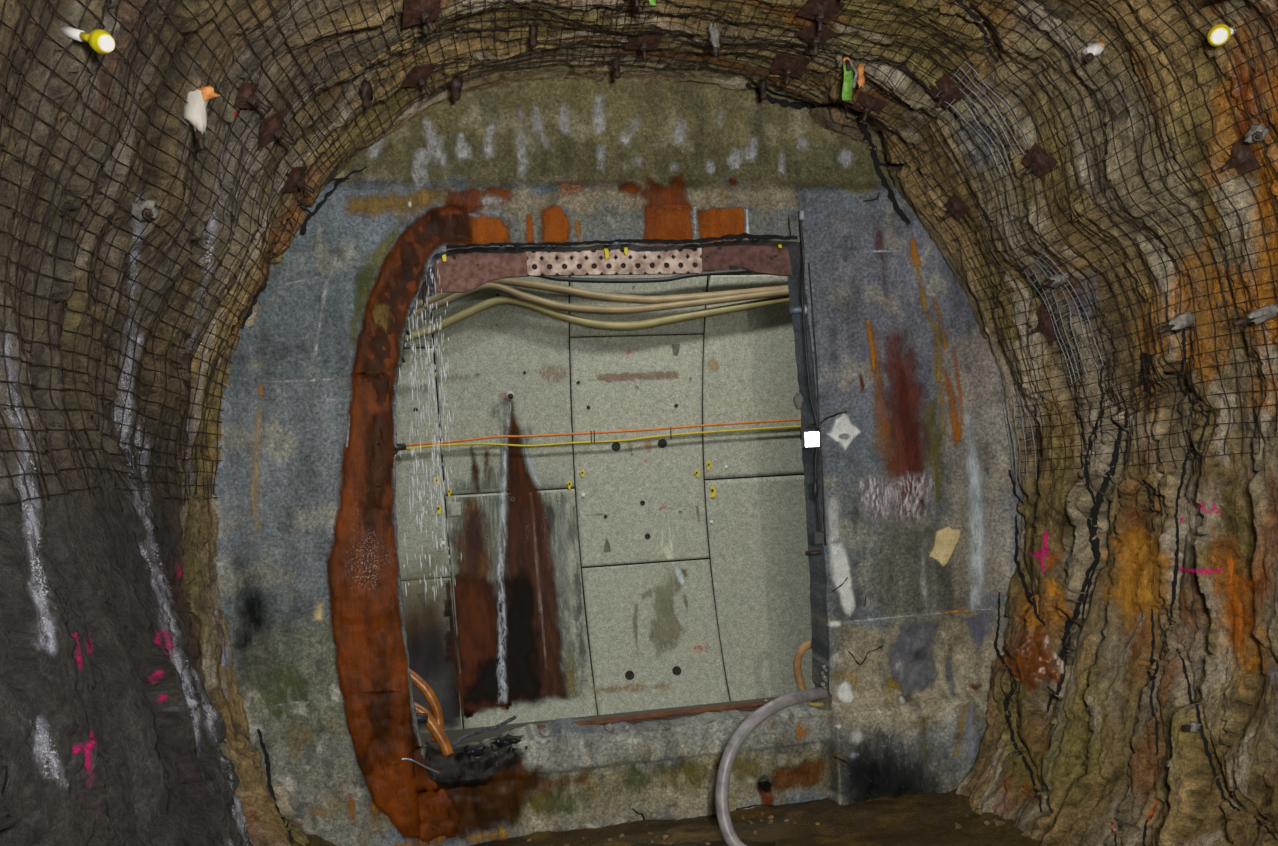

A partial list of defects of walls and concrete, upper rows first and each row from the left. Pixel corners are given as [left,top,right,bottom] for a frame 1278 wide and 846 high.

efflorescence [397,120,494,190]
efflorescence [515,107,547,178]
efflorescence [593,95,605,169]
corrosion [619,176,744,245]
efflorescence [707,138,757,173]
crack [745,83,911,225]
efflorescence [838,150,852,167]
corrosion [860,239,964,520]
leakage [403,559,454,727]
corrosion [327,181,585,846]
corrosion [450,393,643,712]
crack [994,329,1277,846]